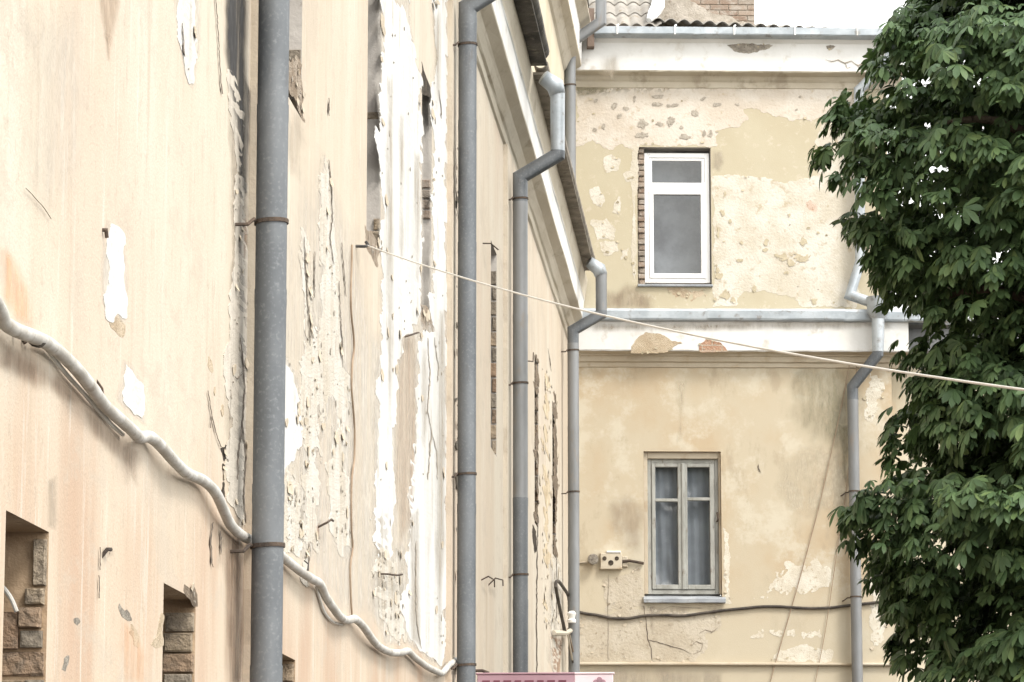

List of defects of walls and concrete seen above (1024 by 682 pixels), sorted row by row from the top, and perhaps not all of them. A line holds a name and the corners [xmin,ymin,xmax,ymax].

peeling [176,0,199,84]
peeling [576,88,859,309]
peeling [103,224,128,337]
peeling [121,364,145,419]
peeling [284,161,352,587]
peeling [365,0,458,667]
flaking render [631,332,682,354]
flaking render [699,339,728,353]
peeling [863,373,885,422]
peeling [532,355,563,672]
peeling [753,558,833,599]
crack [644,606,716,661]